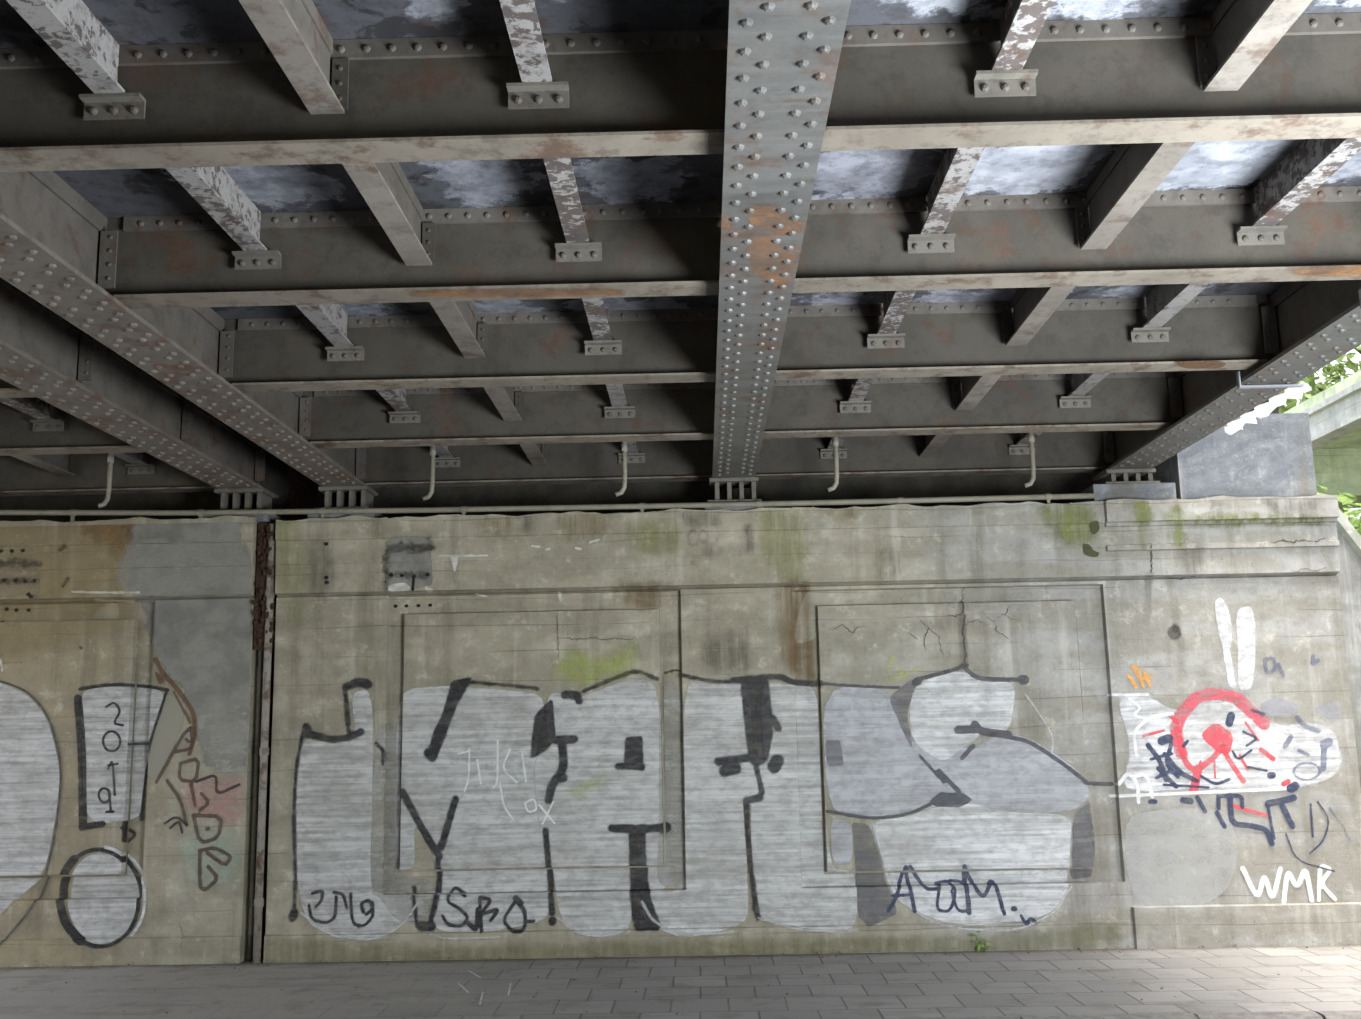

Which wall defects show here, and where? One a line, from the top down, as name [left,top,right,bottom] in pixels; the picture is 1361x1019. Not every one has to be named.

rust [252,523,276,650]
crack [906,585,1019,662]